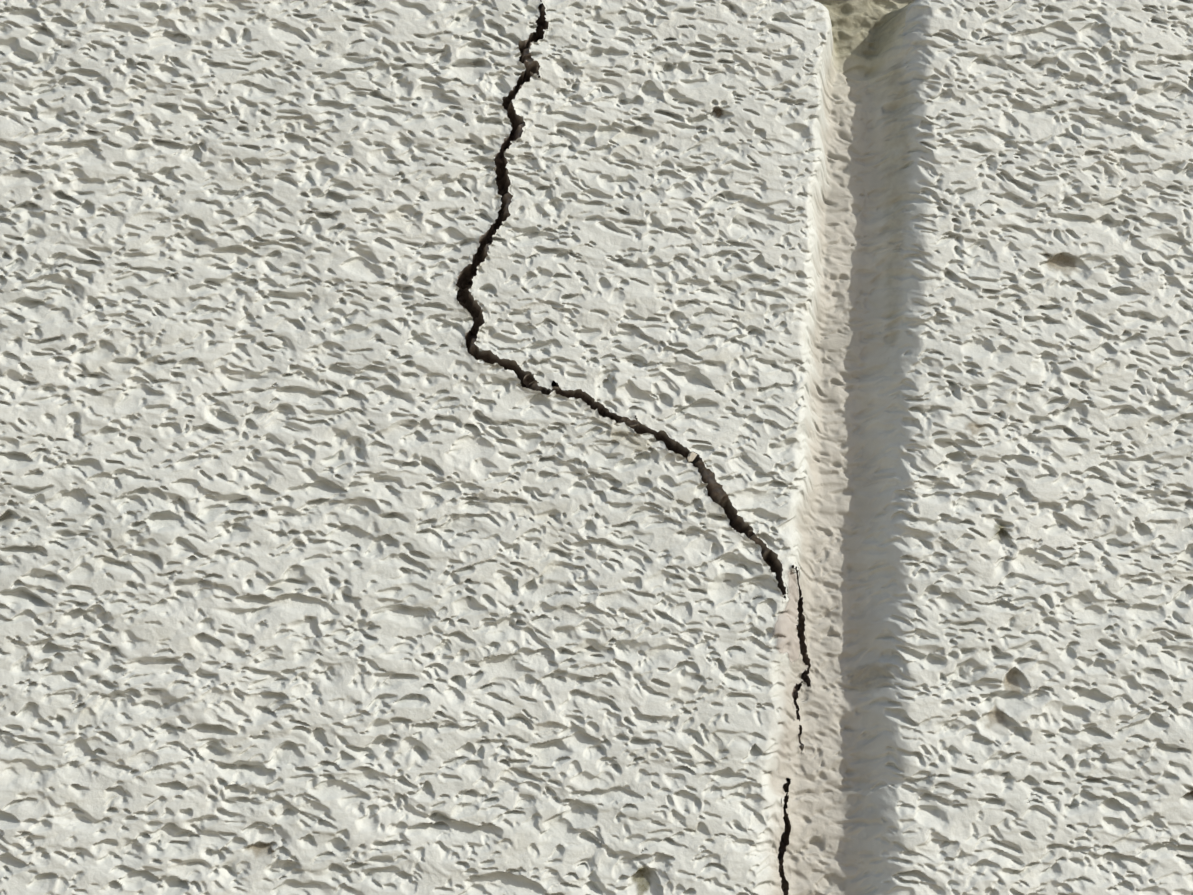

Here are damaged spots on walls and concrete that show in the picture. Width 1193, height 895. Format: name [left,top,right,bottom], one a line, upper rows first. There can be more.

crack [455,0,814,752]
crack [778,780,792,895]